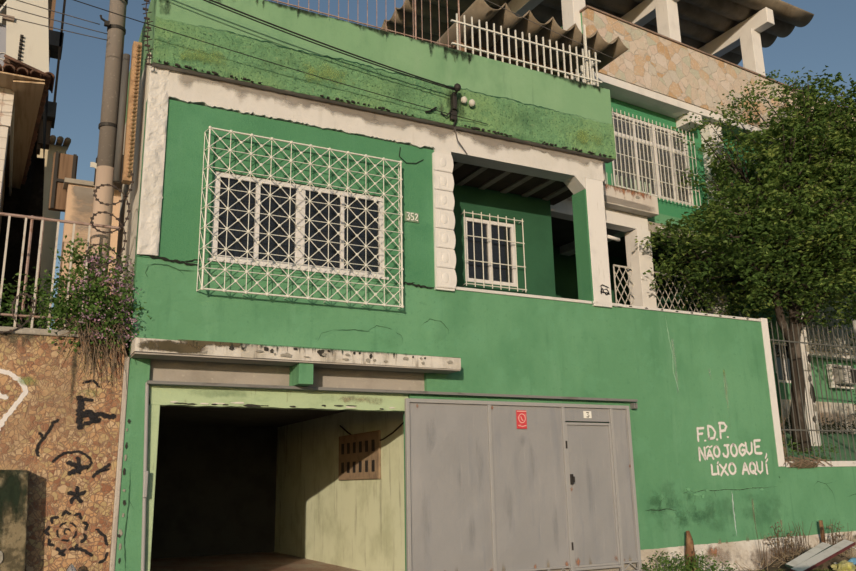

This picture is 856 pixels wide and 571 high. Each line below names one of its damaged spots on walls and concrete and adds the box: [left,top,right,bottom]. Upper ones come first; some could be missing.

leakage [256,0,396,36]
leakage [413,38,472,62]
leakage [551,74,600,92]
crack [138,254,201,275]
peeling [256,347,330,358]
leakage [0,470,26,534]
crack [646,486,776,511]